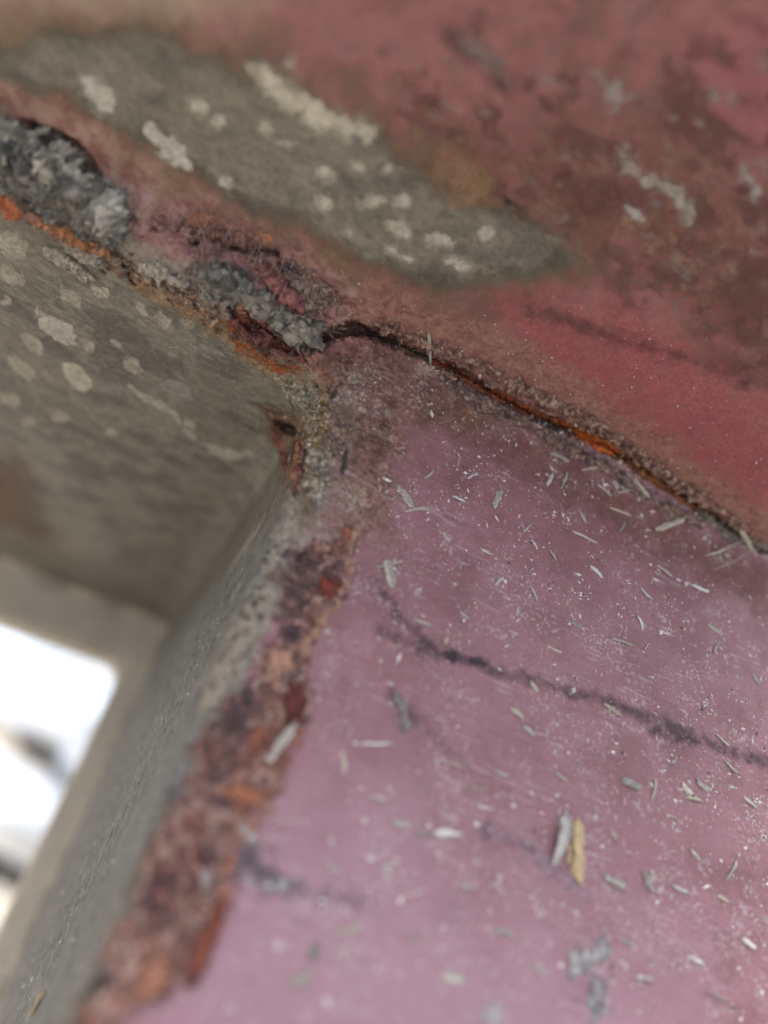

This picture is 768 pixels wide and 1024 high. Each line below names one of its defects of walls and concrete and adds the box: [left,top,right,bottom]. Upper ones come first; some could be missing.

peeling [0,20,590,300]
corrosion [104,204,292,378]
crack [259,381,342,497]
crack [303,317,768,555]